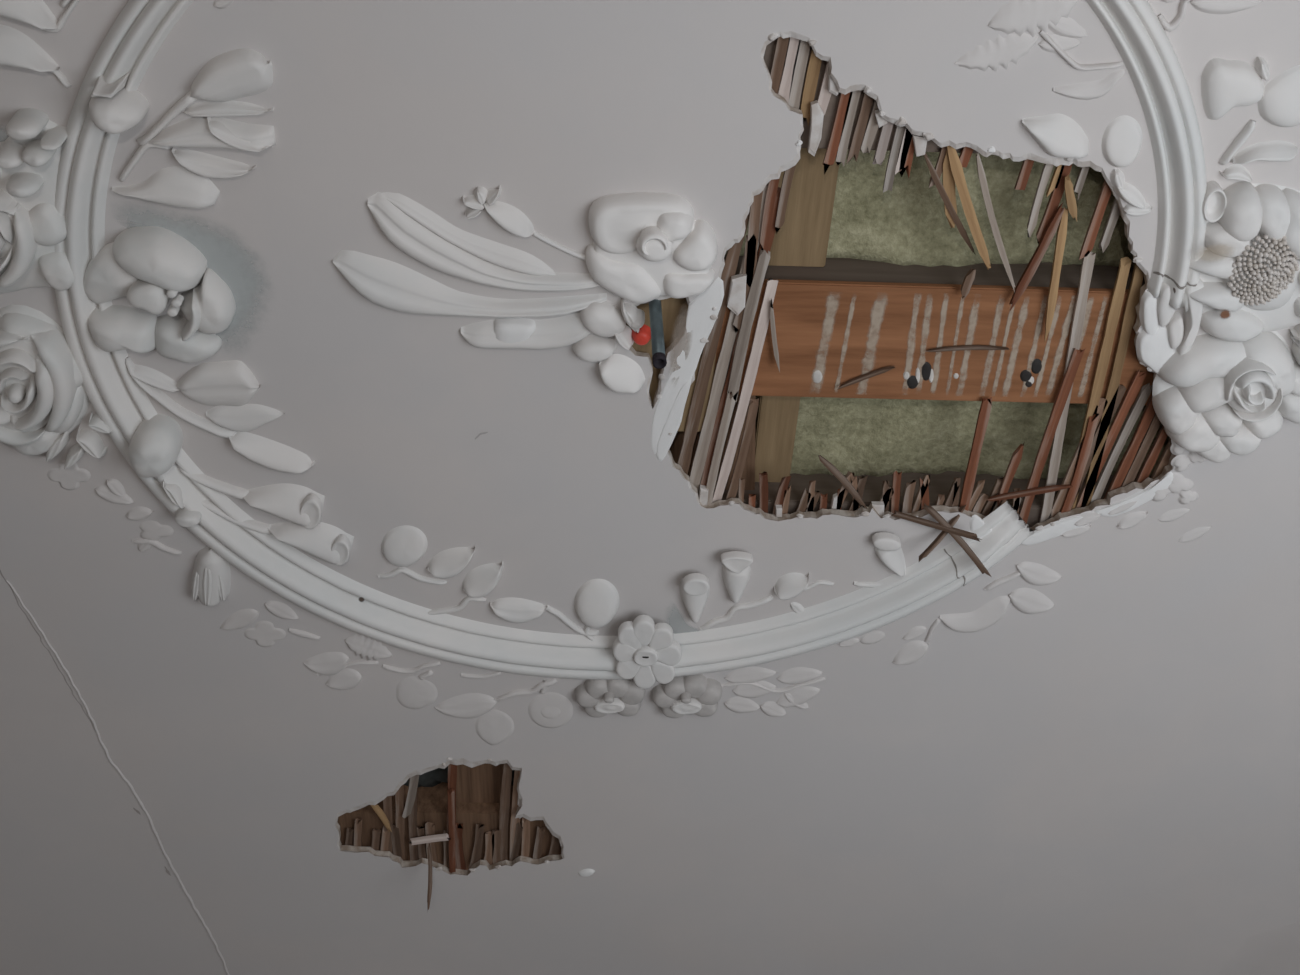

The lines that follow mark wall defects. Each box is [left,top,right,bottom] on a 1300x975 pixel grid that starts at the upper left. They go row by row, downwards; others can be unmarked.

spalling [620,31,1204,545]
crack [0,570,230,975]
spalling [335,757,565,876]